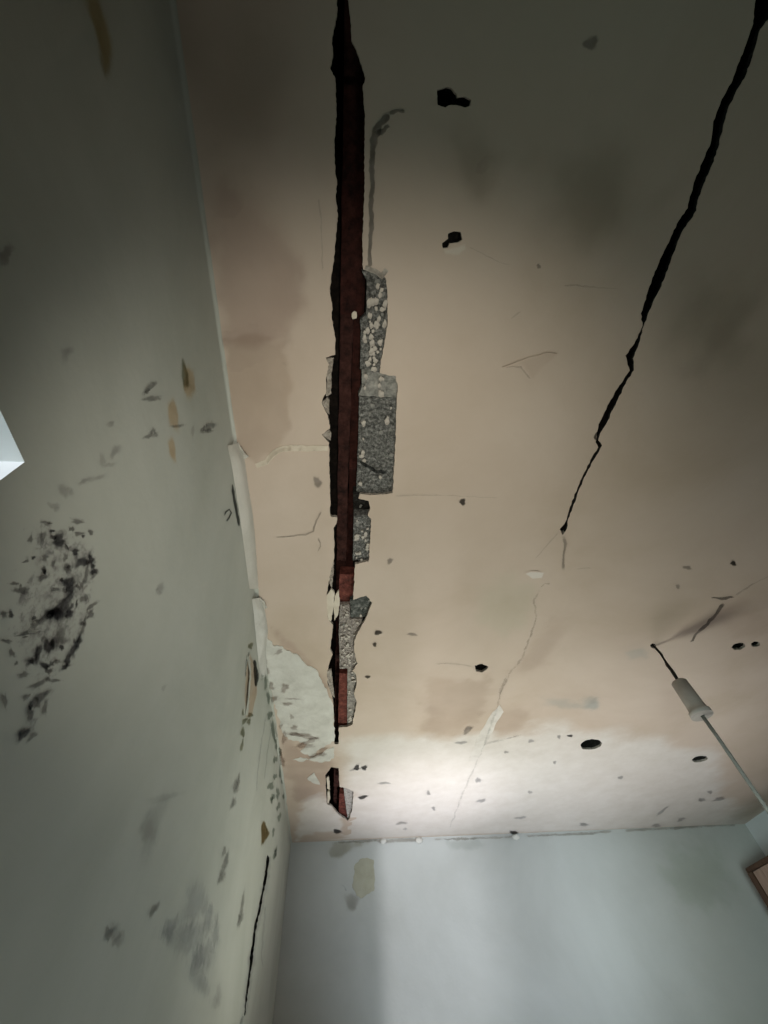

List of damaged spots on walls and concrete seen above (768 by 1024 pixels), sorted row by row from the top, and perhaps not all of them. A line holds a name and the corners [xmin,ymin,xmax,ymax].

crack [560,0,768,531]
spalling [353,266,397,561]
mould [49,530,97,574]
mould [46,578,77,620]
mould [30,635,81,670]
spalling [339,595,371,724]
peeling [245,639,335,785]
spalling [344,788,353,818]
peeling [352,858,375,898]